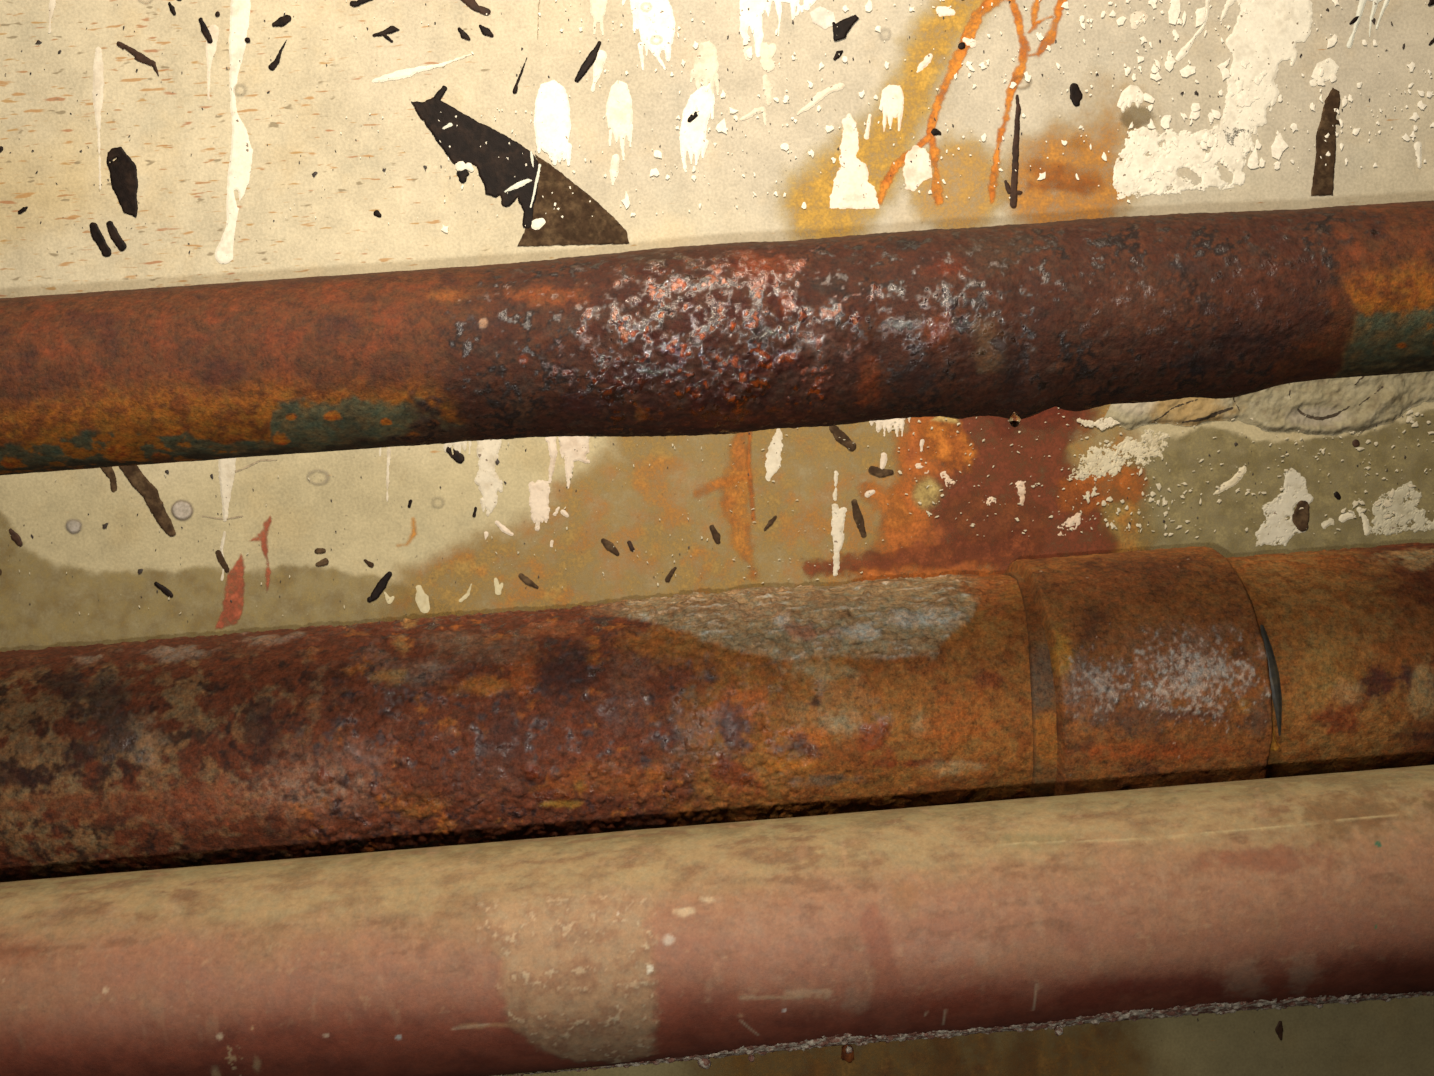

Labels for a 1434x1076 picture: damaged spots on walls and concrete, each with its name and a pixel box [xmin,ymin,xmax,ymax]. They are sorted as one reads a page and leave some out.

corrosion [785,0,1128,239]
spalling [1104,371,1434,436]
corrosion [399,404,1146,619]